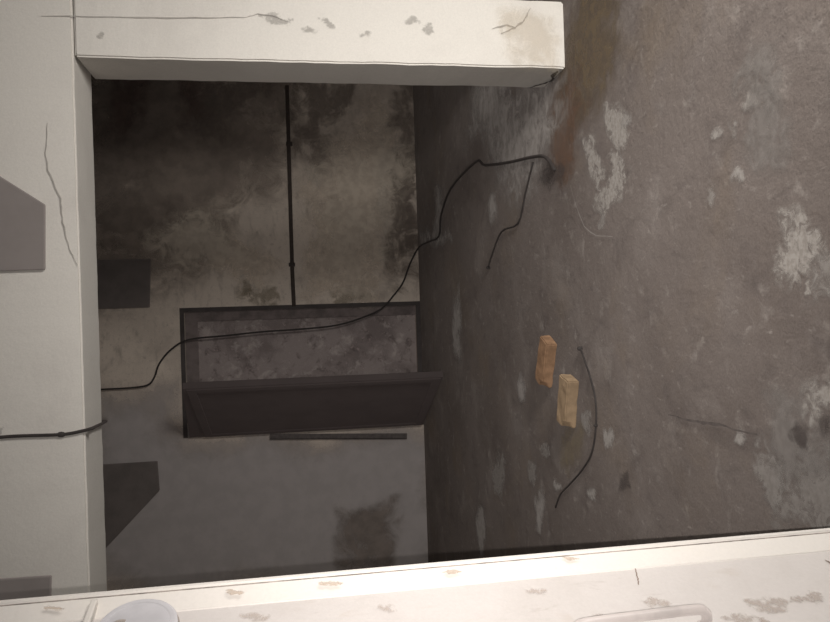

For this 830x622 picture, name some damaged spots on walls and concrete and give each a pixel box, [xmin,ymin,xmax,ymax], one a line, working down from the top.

crack [45,123,77,264]
damp [91,75,294,285]
damp [296,83,452,302]
corrosion [551,0,618,180]